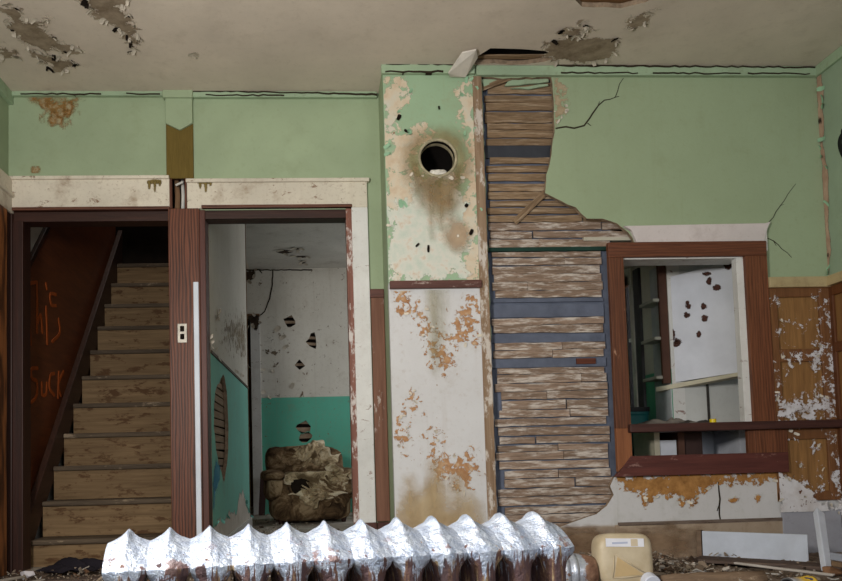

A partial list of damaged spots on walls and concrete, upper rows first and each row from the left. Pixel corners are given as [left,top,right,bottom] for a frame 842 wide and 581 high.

peeling [0,3,85,76]
peeling [75,0,143,55]
peeling [539,20,621,67]
peeling [625,8,662,31]
crack [556,65,815,129]
crack [767,185,795,258]
flaking render [383,75,842,526]
flaking render [214,379,225,472]
peeling [214,490,254,536]
damp [396,478,481,528]